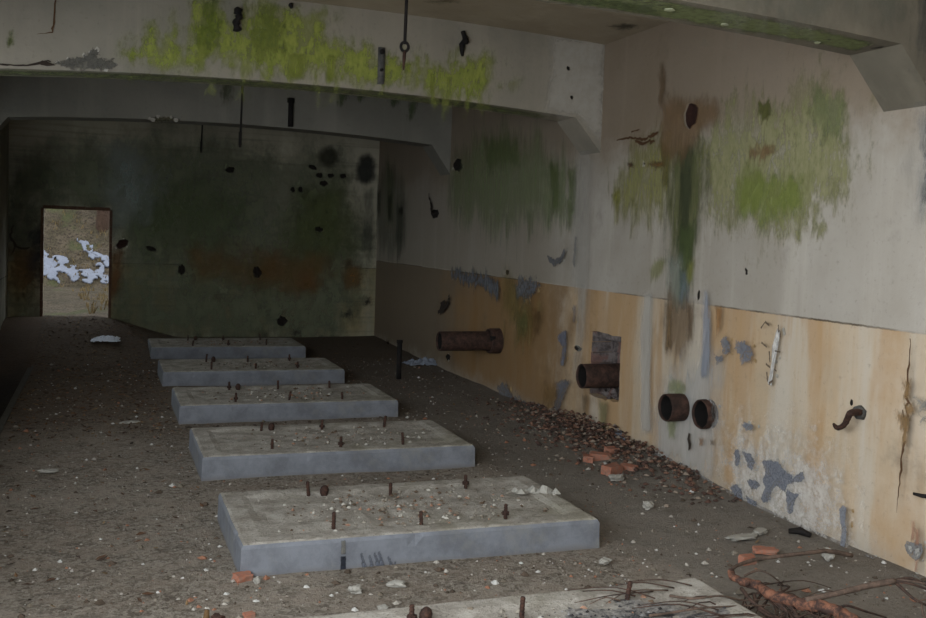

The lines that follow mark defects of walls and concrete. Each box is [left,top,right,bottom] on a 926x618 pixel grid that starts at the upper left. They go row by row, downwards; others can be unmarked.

damp [659,69,716,356]
peeling [714,337,756,364]
peeling [721,421,854,547]
crack [896,339,911,513]